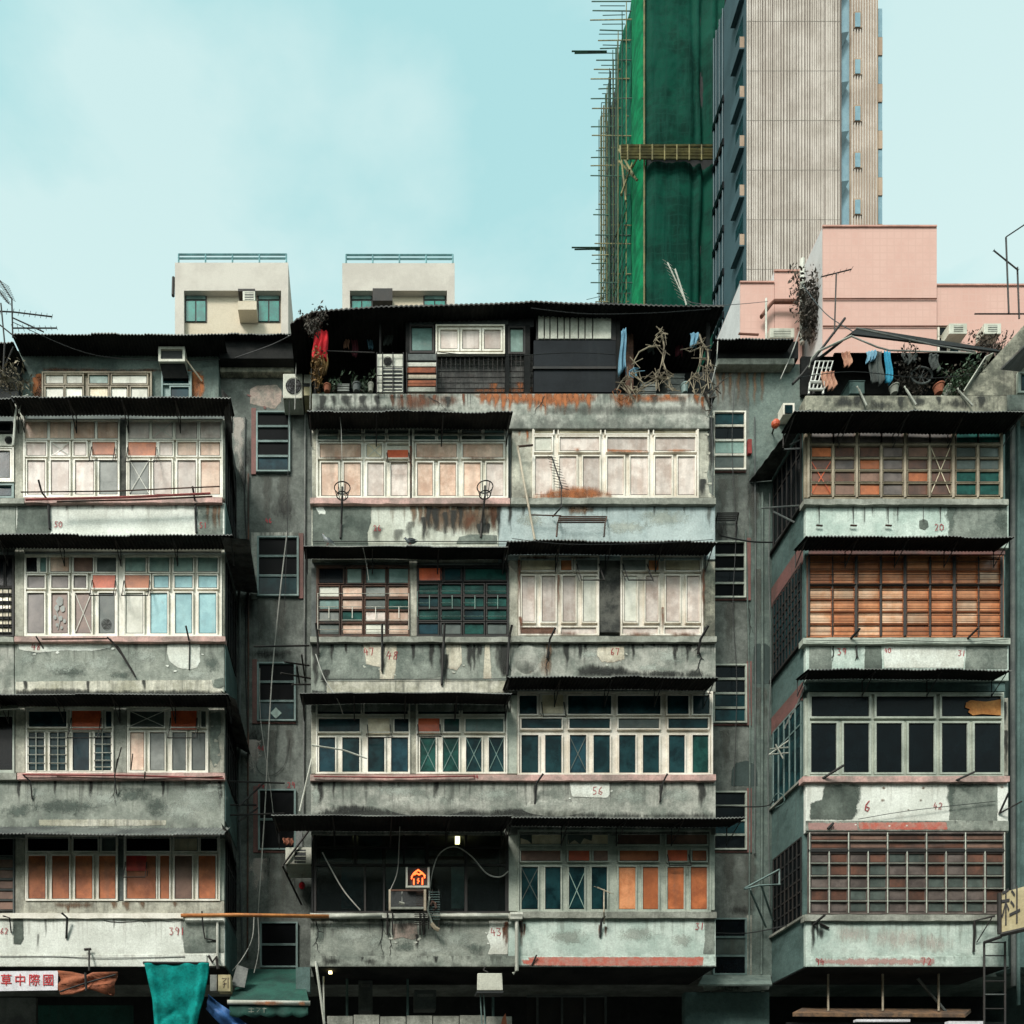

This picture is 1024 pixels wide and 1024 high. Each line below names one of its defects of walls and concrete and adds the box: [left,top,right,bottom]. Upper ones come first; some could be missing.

peeling [247,385,283,409]
rust [390,393,465,408]
rust [478,382,593,410]
rust [616,394,679,406]
rust [541,487,603,513]
peeling [16,644,223,693]
water stain [312,644,347,693]
peeling [327,644,509,693]
water stain [429,644,448,677]
water stain [467,644,482,668]
water stain [537,644,701,676]
water stain [8,781,222,819]